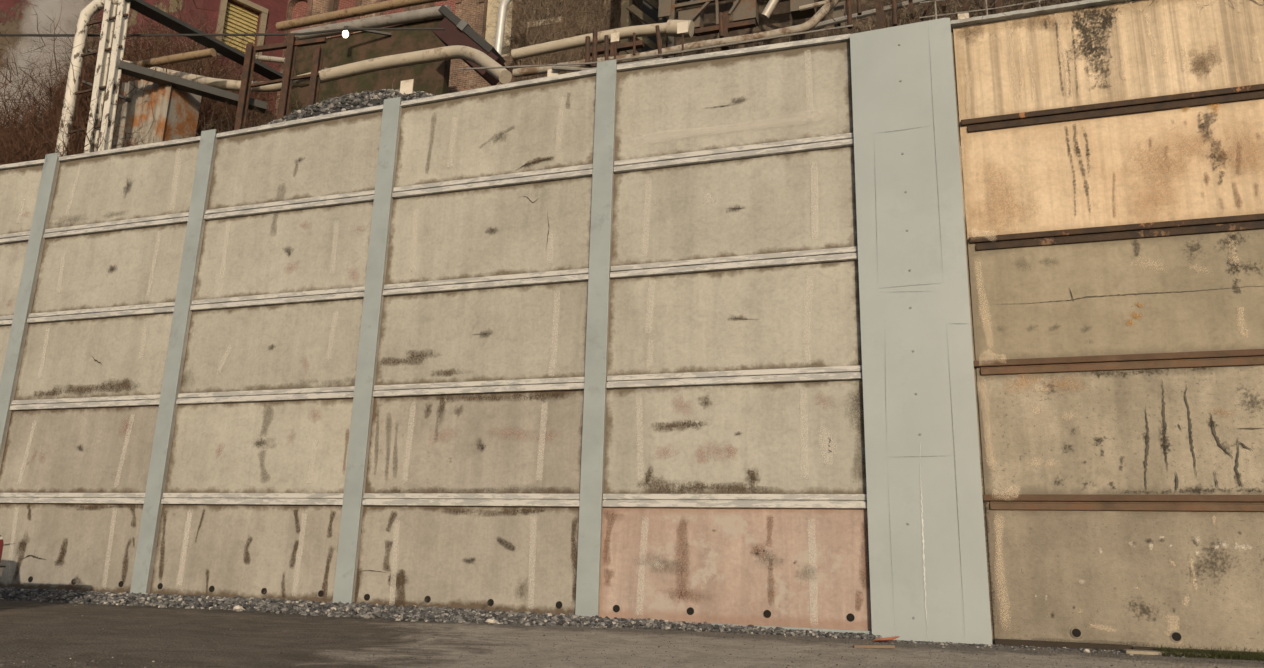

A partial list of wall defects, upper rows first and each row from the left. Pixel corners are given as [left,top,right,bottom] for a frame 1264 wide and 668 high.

leakage [1031,6,1118,94]
leakage [1066,126,1089,216]
leakage [1198,113,1227,183]
crack [1014,286,1256,304]